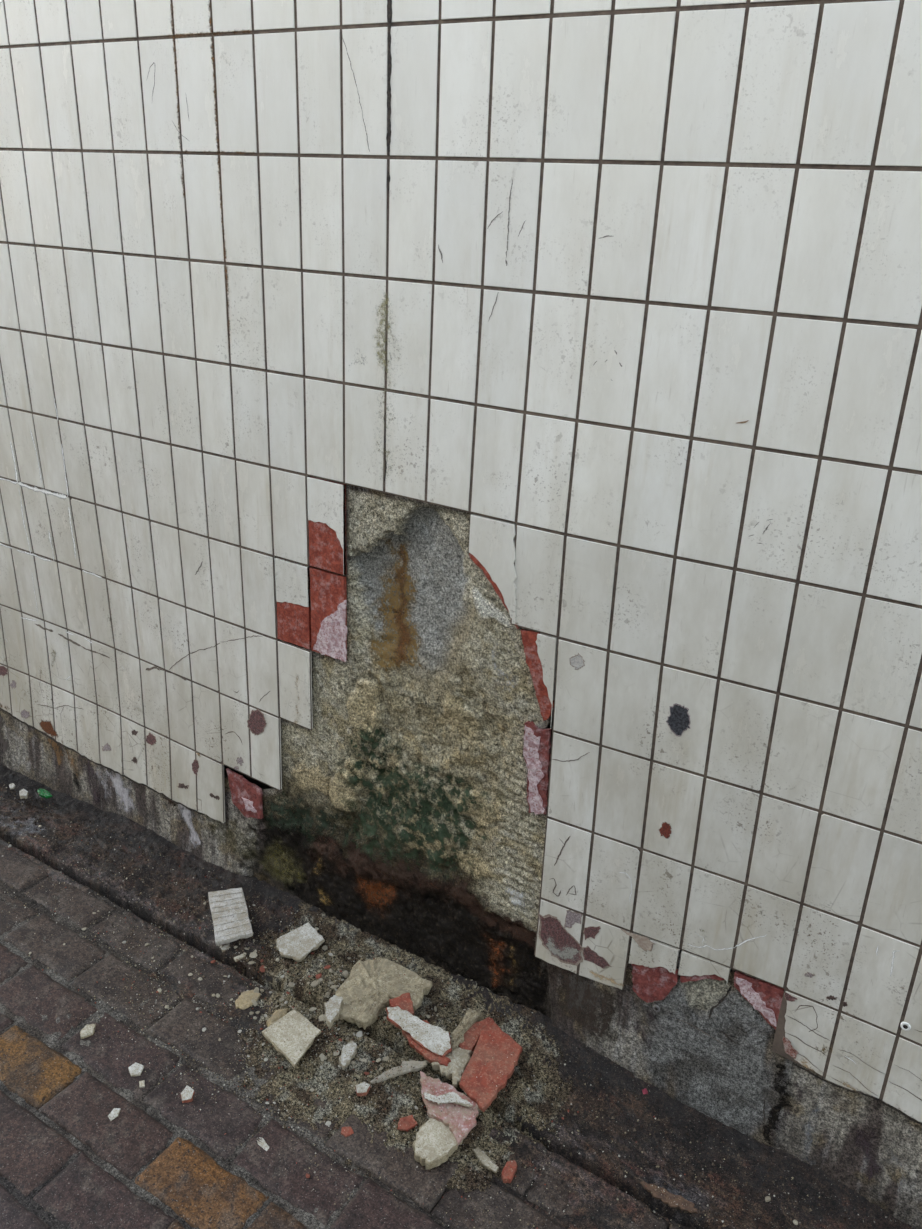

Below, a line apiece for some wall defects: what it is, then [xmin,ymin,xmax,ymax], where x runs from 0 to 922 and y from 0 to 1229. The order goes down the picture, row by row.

corrosion [366,539,422,673]
damp [73,755,135,811]
efflorescence [178,802,201,848]
spalling [209,476,611,1017]
damp [264,818,623,1040]
spalling [620,928,798,1059]
damp [763,1063,802,1144]
crack [785,1005,922,1125]